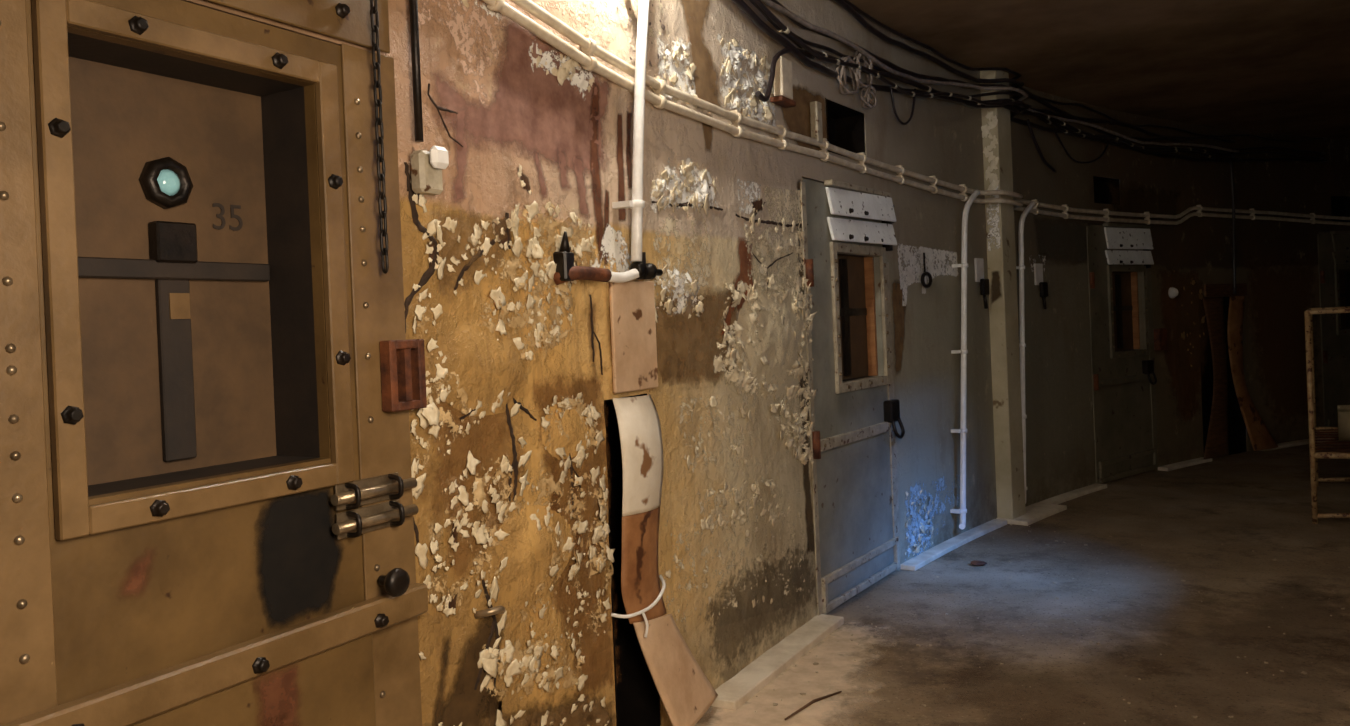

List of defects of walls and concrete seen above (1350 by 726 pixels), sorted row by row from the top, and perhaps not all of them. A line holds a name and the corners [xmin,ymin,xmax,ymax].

peeling [410,164,615,726]
peeling [529,42,596,101]
peeling [644,264,704,323]
peeling [650,158,717,213]
peeling [663,198,818,622]
damp [707,372,815,666]